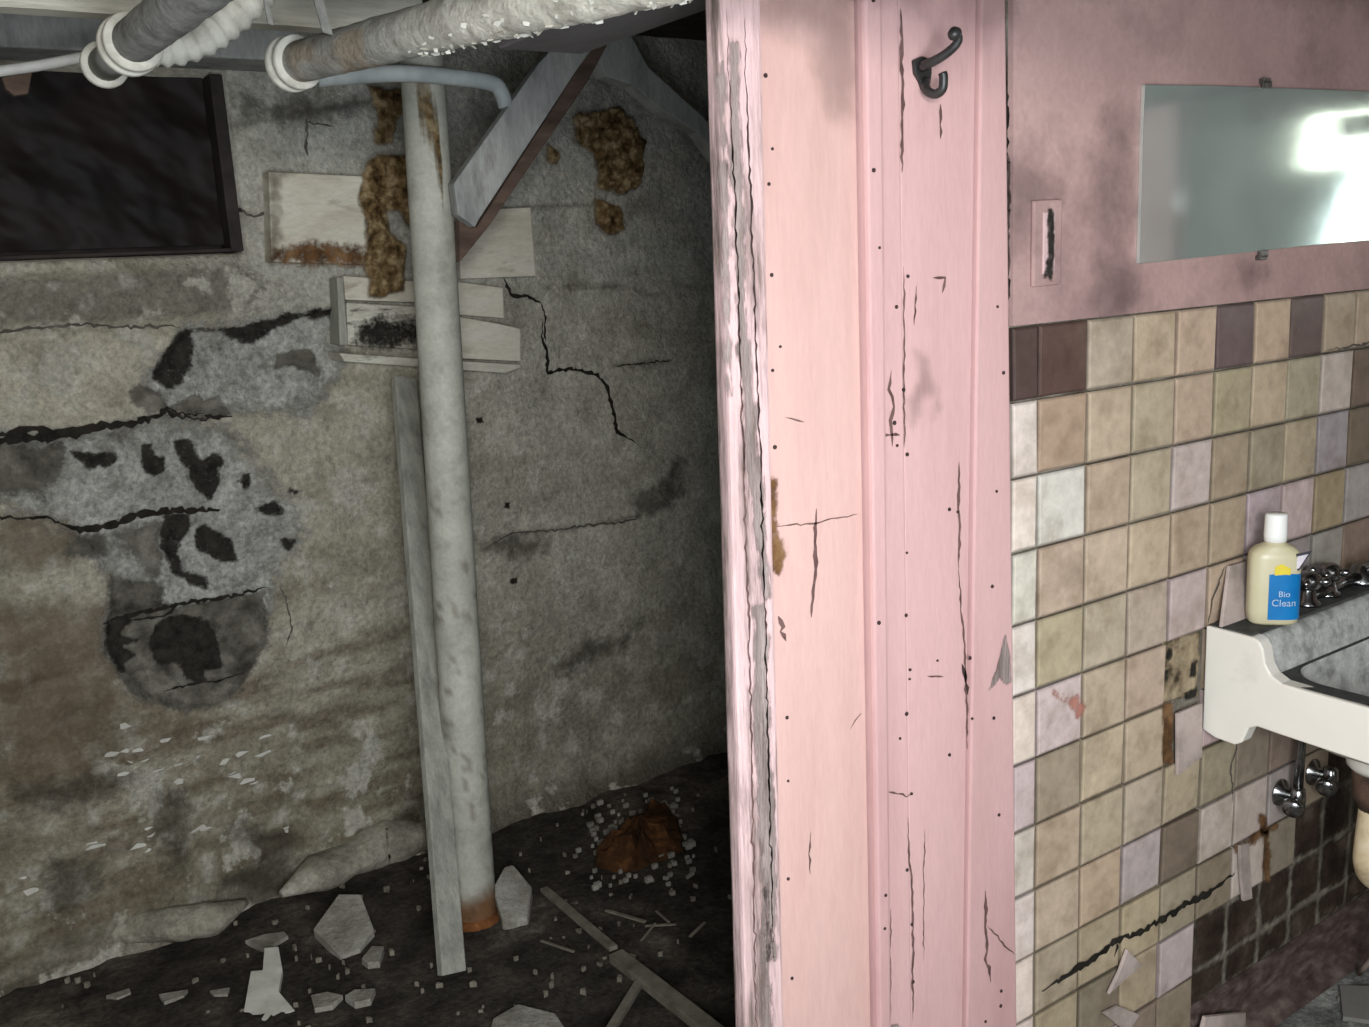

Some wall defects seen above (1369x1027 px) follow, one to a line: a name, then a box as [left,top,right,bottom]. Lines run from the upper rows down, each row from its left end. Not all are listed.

peeling [408,0,611,57]
crack [504,278,670,442]
crack [0,406,232,445]
crack [0,506,221,534]
spalling [0,306,346,711]
crack [726,9,857,1027]
spalling [1219,560,1247,627]
peeling [1161,632,1203,775]
crack [1042,873,1235,992]